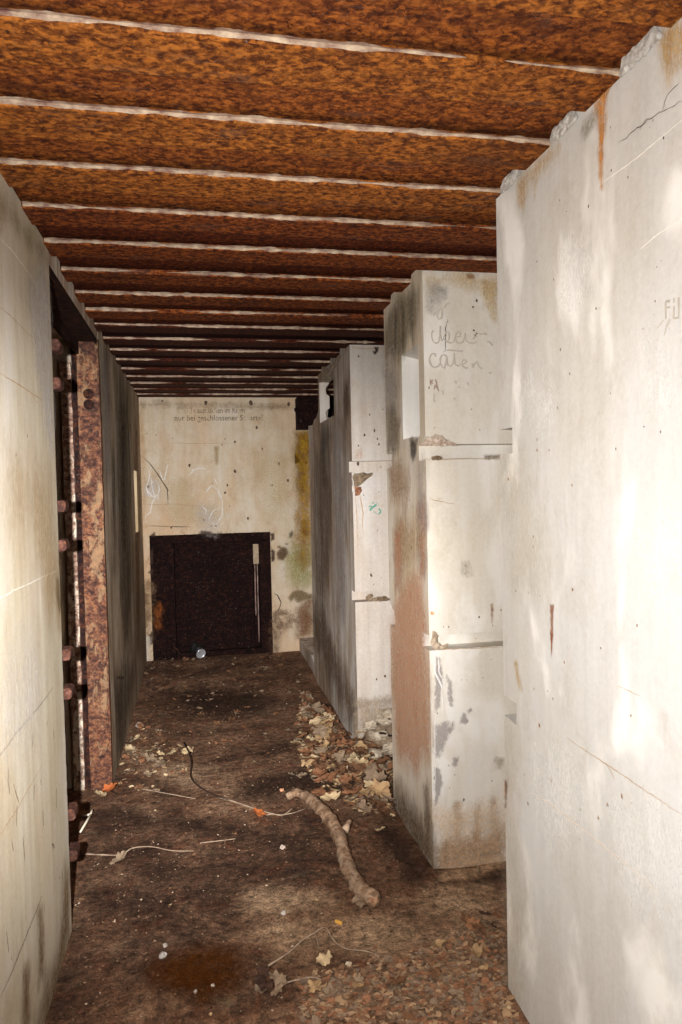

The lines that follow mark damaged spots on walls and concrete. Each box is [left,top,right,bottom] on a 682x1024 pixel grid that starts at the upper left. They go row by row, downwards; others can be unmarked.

corrosion [597,87,610,160]
crack [621,84,680,141]
damp [75,271,416,637]
spalling [352,462,381,496]
spalling [421,427,457,460]
corrosion [136,532,161,644]
damp [272,430,391,736]
peeling [430,626,471,801]
damp [396,655,506,870]